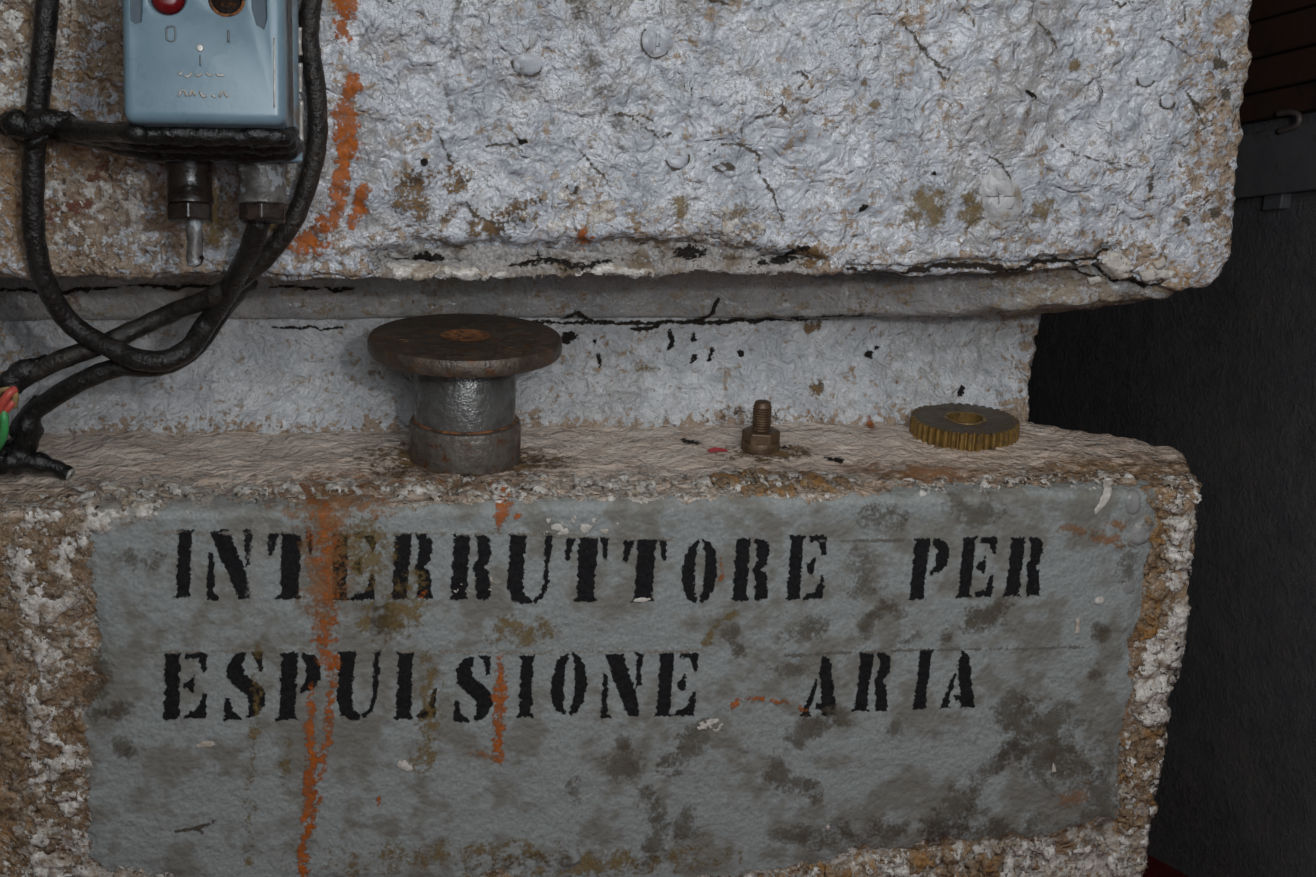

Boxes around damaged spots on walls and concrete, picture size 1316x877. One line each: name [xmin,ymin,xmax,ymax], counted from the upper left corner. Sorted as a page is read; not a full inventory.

corrosion [331,0,358,43]
corrosion [288,72,372,259]
crack [846,247,1166,288]
crack [0,284,210,295]
crack [272,324,343,332]
crack [533,297,876,332]
damp [339,517,428,641]
damp [941,602,1008,640]
corrosion [268,442,579,877]
corrosion [731,696,808,712]
damp [869,690,1114,847]
damp [336,737,742,877]